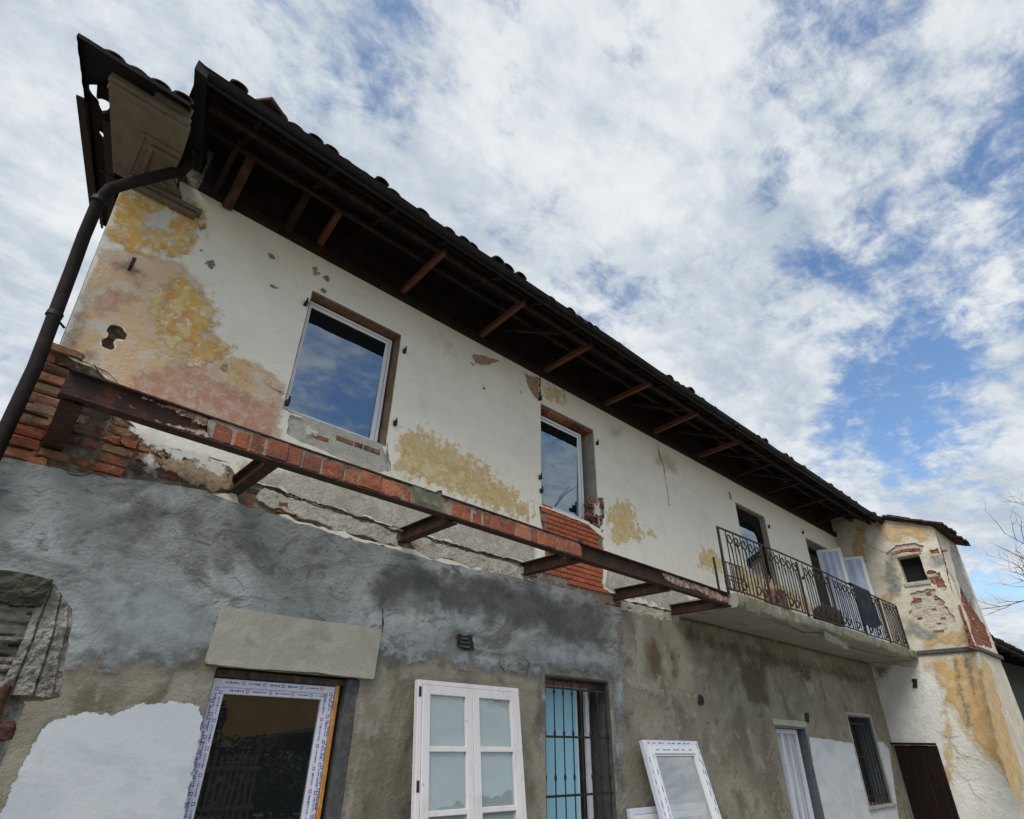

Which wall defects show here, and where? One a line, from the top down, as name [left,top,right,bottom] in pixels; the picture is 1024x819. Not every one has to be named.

peeling [2,33,536,522]
spalling [243,471,537,580]
peeling [583,497,656,545]
spalling [601,545,814,624]
spalling [912,571,995,650]
peeling [944,703,958,782]